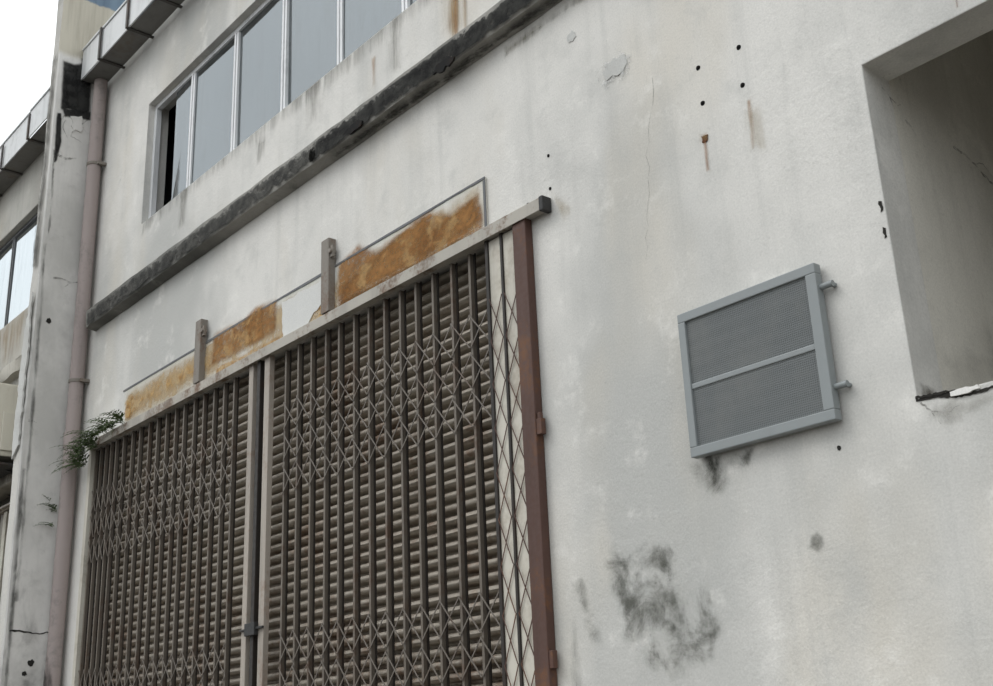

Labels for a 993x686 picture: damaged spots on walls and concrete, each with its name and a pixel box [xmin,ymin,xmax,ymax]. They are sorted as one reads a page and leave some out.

leakage [33,56,91,271]
corrosion [335,198,482,306]
corrosion [125,302,283,417]